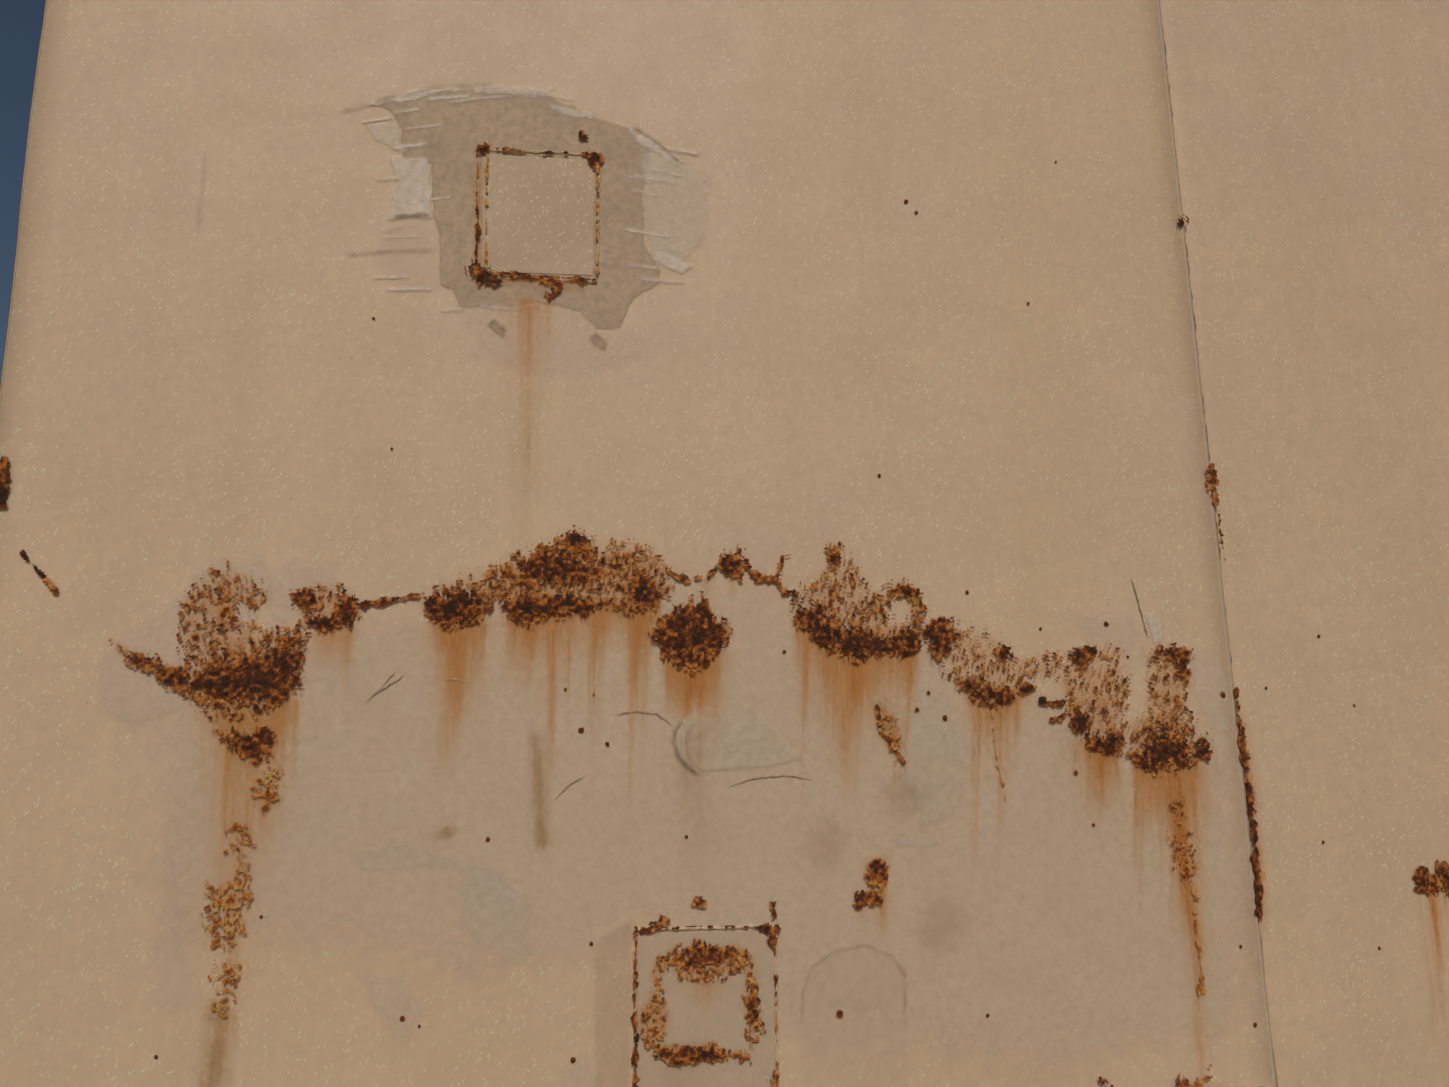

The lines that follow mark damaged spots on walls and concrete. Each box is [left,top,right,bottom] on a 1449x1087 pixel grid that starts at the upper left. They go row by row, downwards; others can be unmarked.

peeling [363,84,705,329]
corrosion [464,130,605,301]
corrosion [109,525,1214,1018]
corrosion [1220,687,1264,922]
corrosion [1414,860,1449,931]
corrosion [631,901,781,1087]
corrosion [1176,1064,1212,1087]